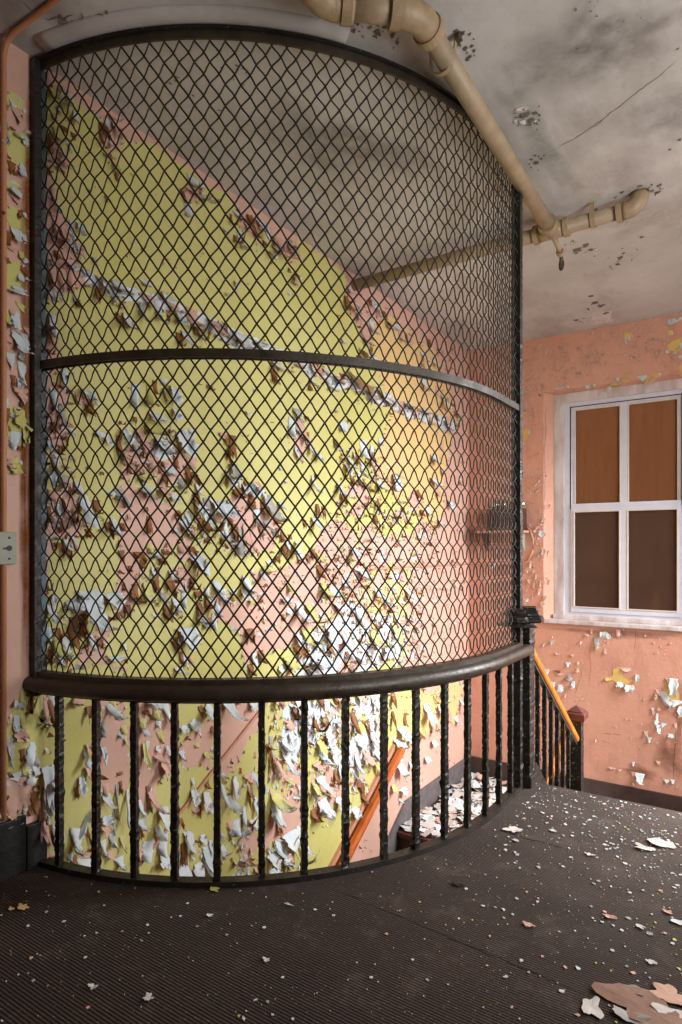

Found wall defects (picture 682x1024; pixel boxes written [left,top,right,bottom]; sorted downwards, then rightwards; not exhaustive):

flaking render [514,104,541,131]
crack [561,64,673,146]
peeling [0,92,35,476]
peeling [44,85,469,678]
peeling [585,317,682,392]
peeling [542,641,580,698]
peeling [584,628,626,655]
peeling [604,667,639,693]
peeling [644,678,682,743]
peeling [0,681,472,877]
peeling [609,762,645,786]